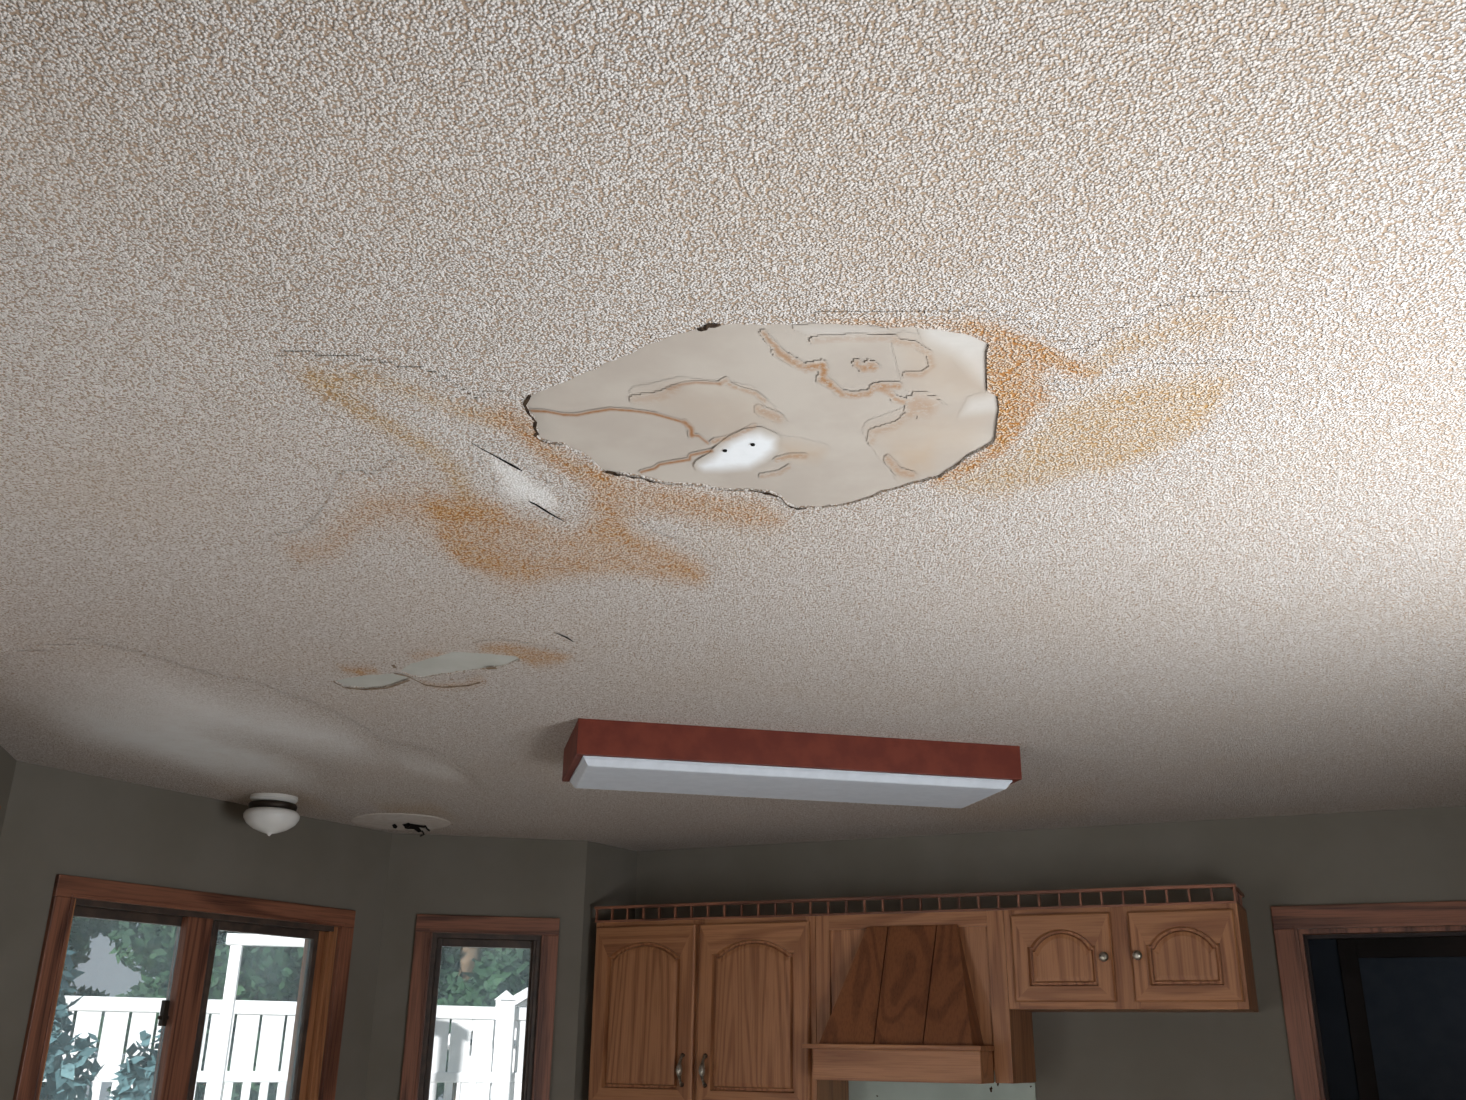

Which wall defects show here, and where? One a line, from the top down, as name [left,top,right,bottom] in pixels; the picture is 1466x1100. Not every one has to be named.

damp [267,351,795,605]
damp [815,292,1256,504]
peeling [333,652,519,690]